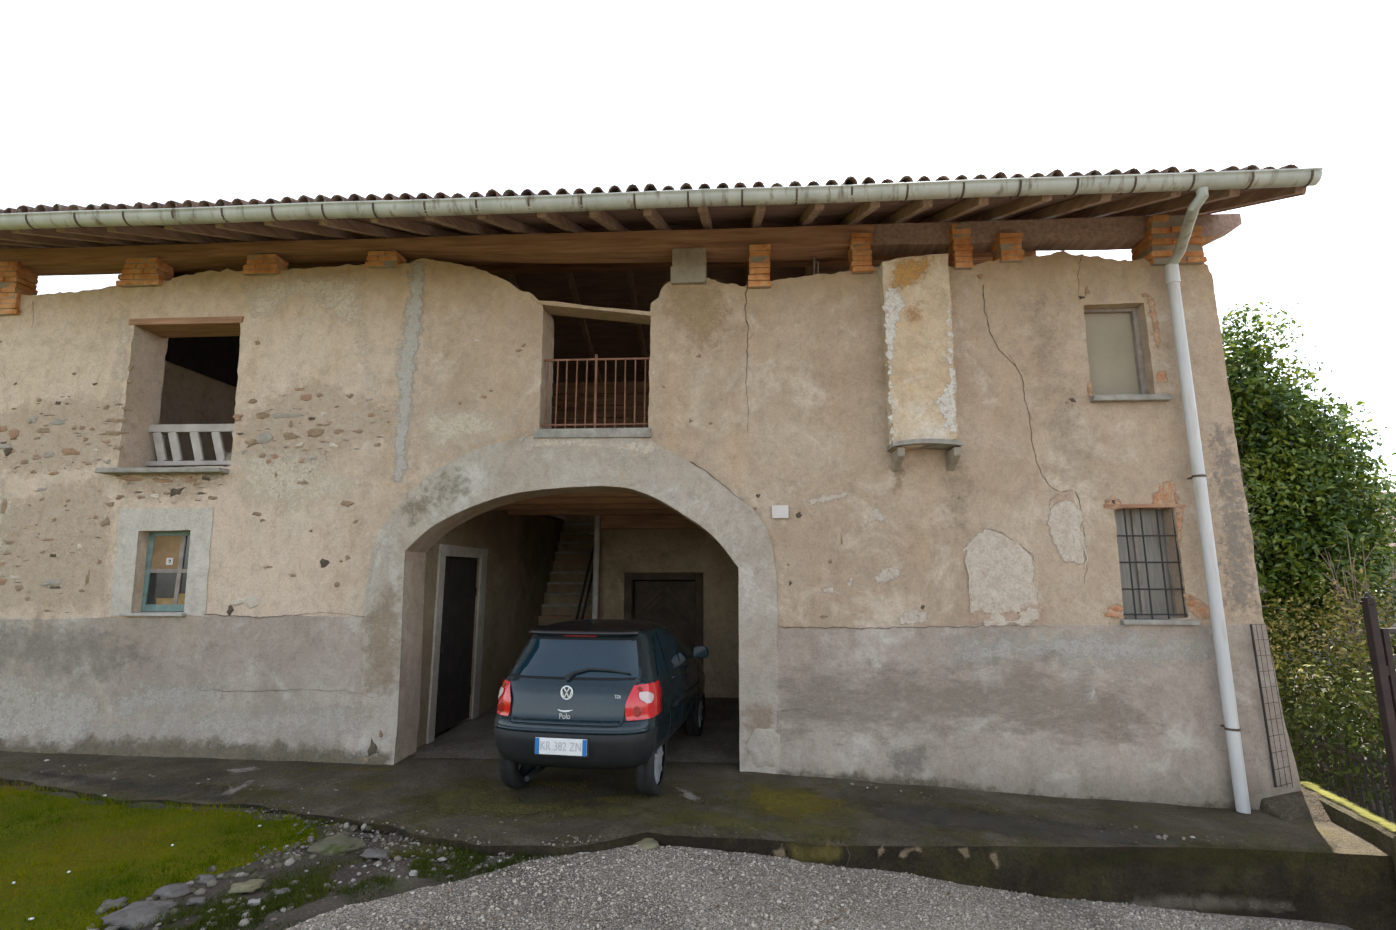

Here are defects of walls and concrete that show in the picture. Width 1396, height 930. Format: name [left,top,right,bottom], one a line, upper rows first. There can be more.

crack [744,282,753,433]
peeling [882,287,905,444]
peeling [934,294,958,433]
flaking render [0,396,225,507]
flaking render [232,385,389,485]
crack [983,285,1088,583]
peeling [963,529,1043,627]
peeling [1047,494,1088,568]
spalling [1152,480,1183,548]
spalling [1184,593,1210,619]
water stain [1132,896,1289,910]